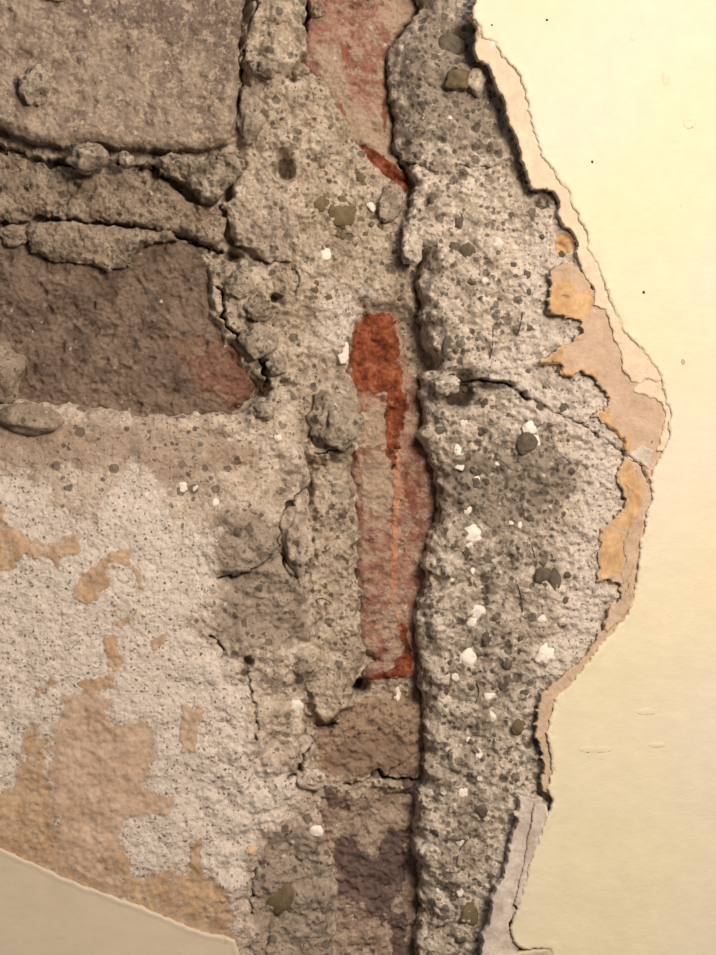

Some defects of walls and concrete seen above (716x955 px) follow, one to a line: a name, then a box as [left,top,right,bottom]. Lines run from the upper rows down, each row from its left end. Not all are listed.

rust [361,144,410,192]
peeling [25,221,178,273]
crack [177,237,223,255]
crack [460,378,598,437]
peeling [359,458,392,520]
rust [350,312,416,680]
flaking render [385,0,625,955]
flaking render [0,385,338,955]
crack [287,722,335,778]
crack [348,768,400,785]